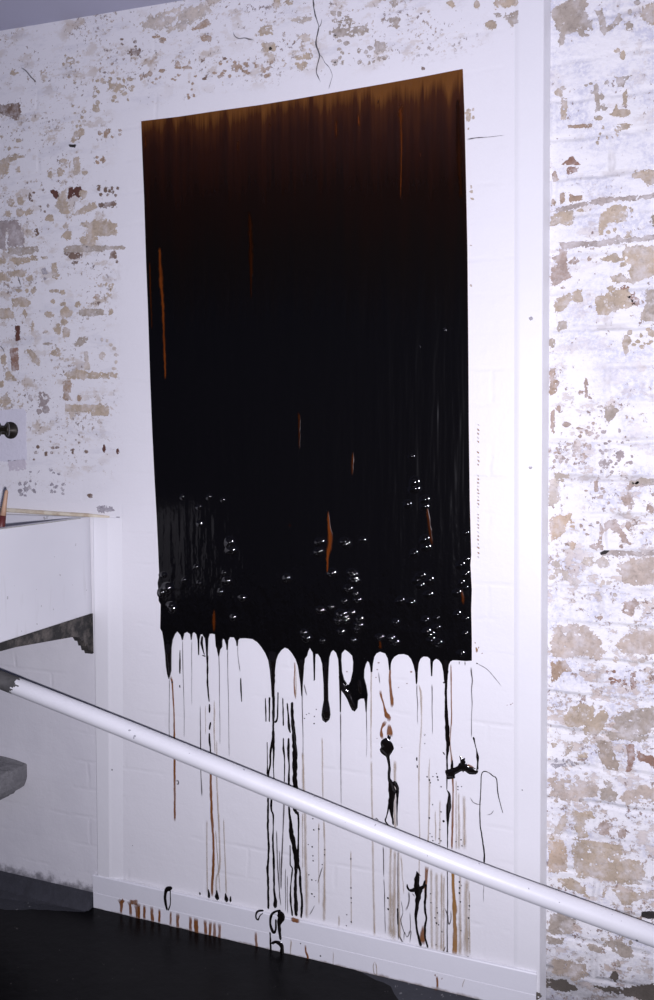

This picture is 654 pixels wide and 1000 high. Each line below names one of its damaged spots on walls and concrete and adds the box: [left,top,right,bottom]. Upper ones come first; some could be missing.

peeling [120,3,212,56]
crack [313,0,332,86]
peeling [329,11,389,66]
peeling [552,0,654,47]
peeling [554,75,632,145]
peeling [552,156,581,182]
peeling [0,24,276,416]
peeling [549,169,654,355]
peeling [548,378,654,617]
peeling [550,616,654,690]
peeling [547,702,654,919]
peeling [536,936,654,1000]